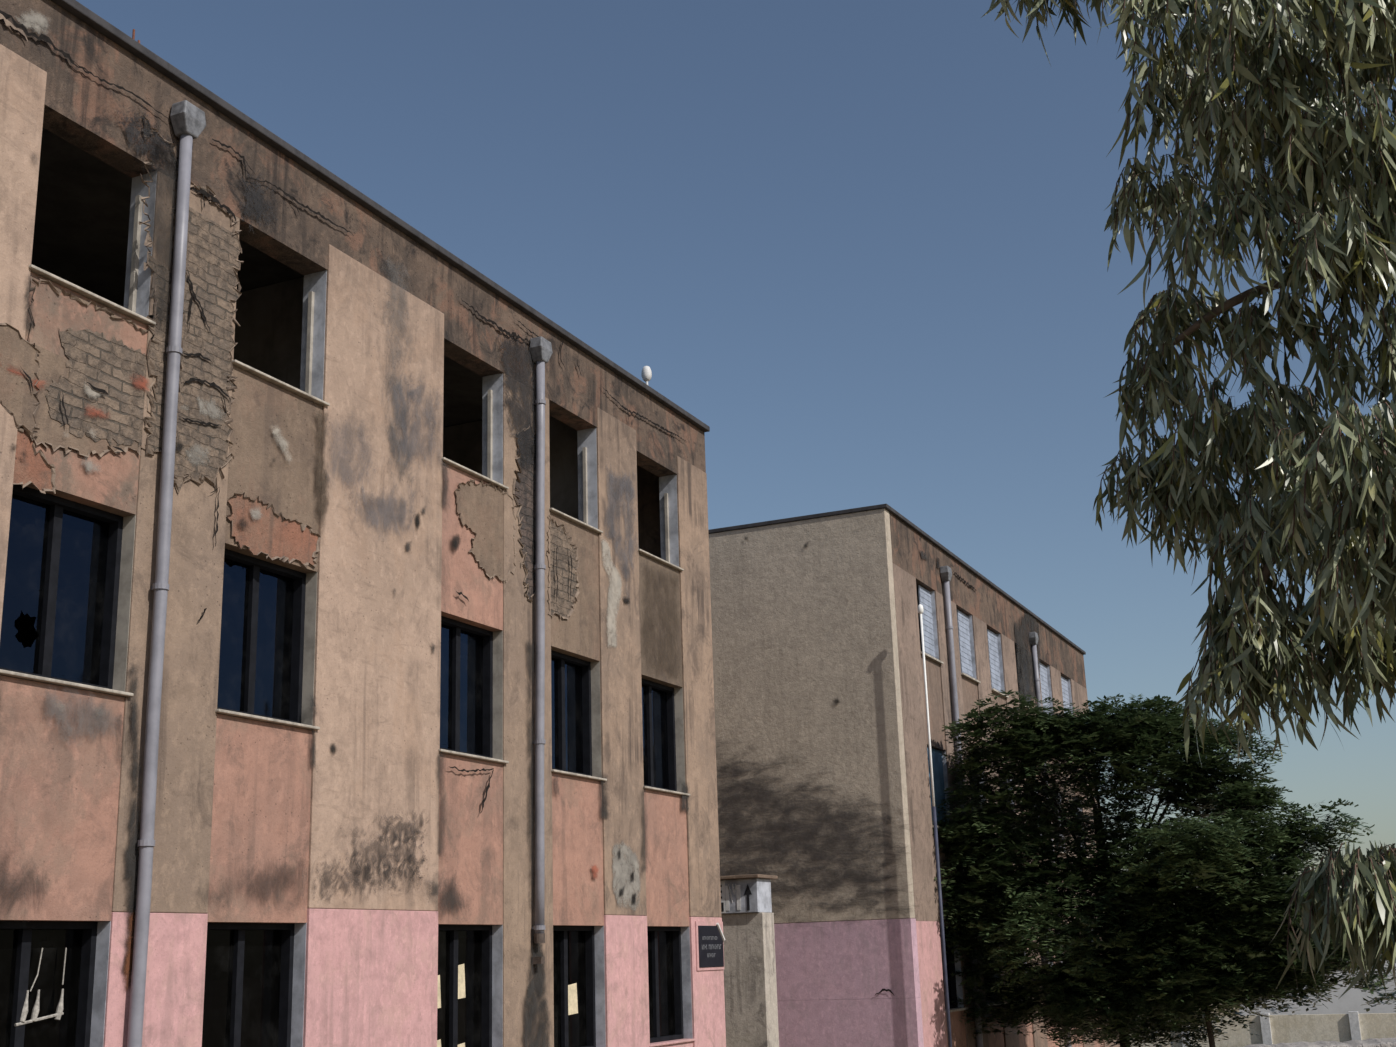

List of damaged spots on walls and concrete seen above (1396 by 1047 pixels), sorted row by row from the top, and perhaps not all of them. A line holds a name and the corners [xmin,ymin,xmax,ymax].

crack [0,10,167,118]
crack [194,188,236,221]
crack [212,139,354,236]
flaking render [0,114,321,569]
peeling [452,426,580,619]
leakage [717,761,896,911]